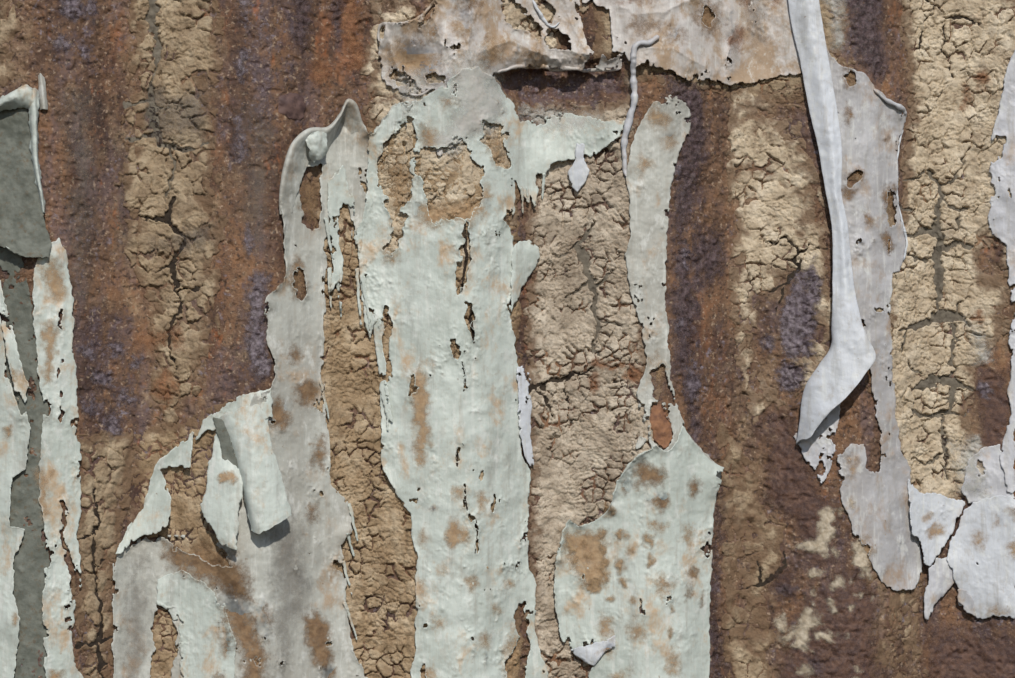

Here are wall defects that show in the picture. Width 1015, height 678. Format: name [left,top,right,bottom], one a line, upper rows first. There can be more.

crack [918,0,980,78]
crack [123,0,210,380]
rust [162,541,251,599]
rust [221,608,267,678]
peeling [0,0,807,678]
crack [526,221,623,427]
rust [648,77,723,433]
rust [766,417,837,564]
rust [780,569,880,678]
peeling [725,0,1015,669]
crack [899,149,974,480]
rust [976,368,1009,447]